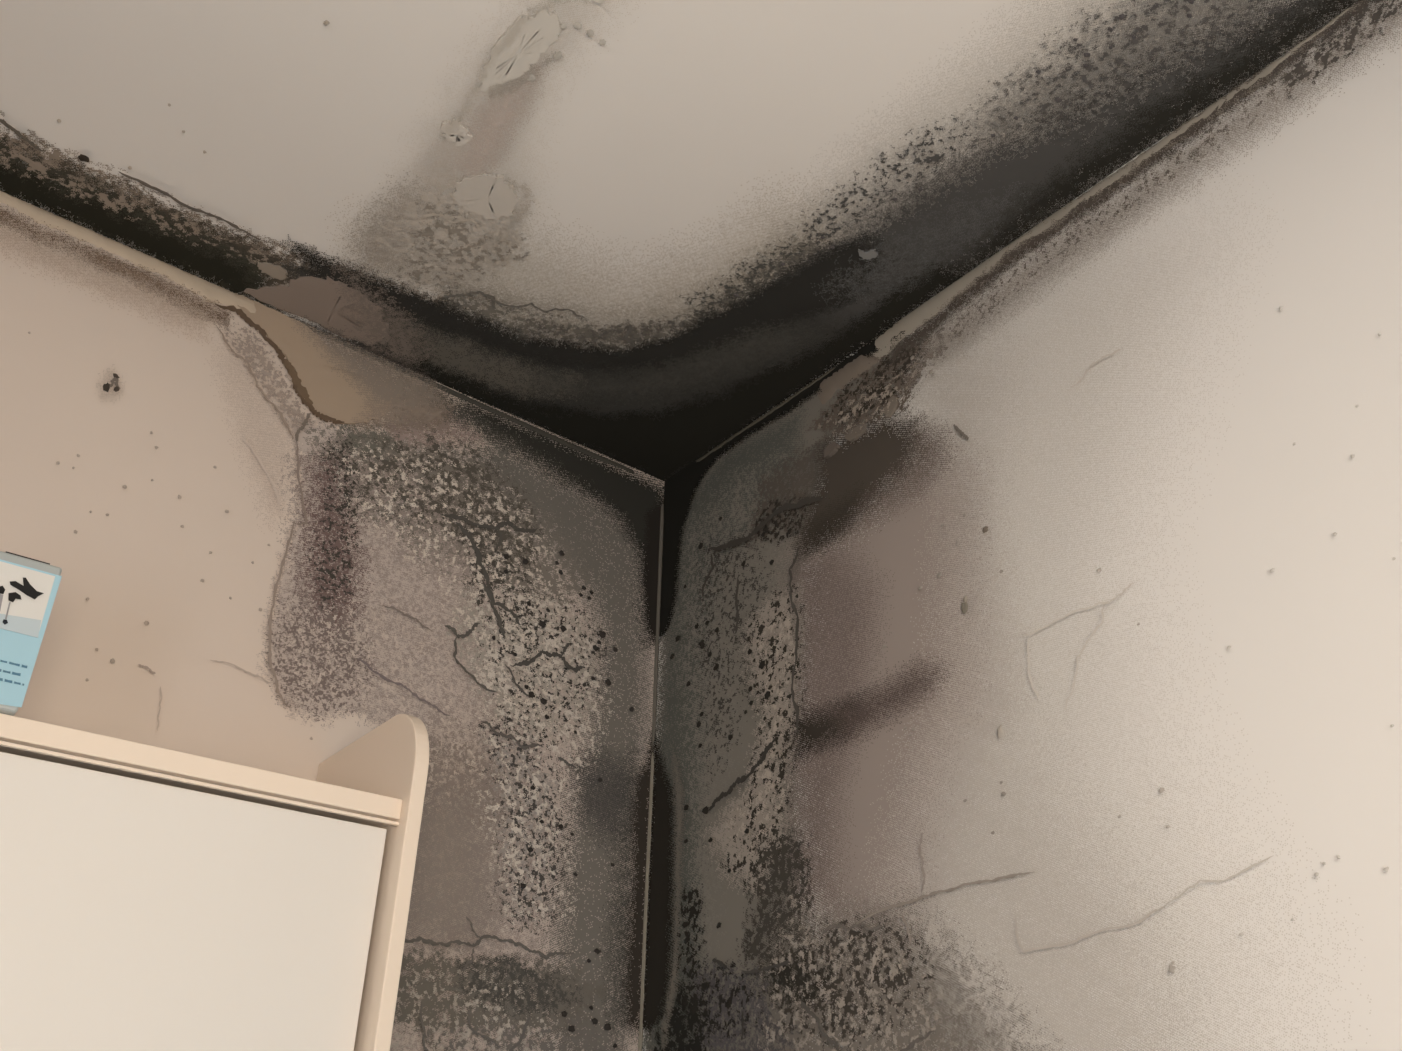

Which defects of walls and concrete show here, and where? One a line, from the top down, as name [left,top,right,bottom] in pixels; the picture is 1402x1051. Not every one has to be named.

peeling [476,7,562,93]
peeling [452,170,520,221]
peeling [235,262,401,425]
crack [702,496,823,634]
crack [357,513,585,769]
crack [708,548,800,811]
crack [405,916,574,971]
crack [847,832,1035,933]
crack [1015,856,1272,953]
crack [419,1002,429,1051]
crack [467,1009,531,1051]